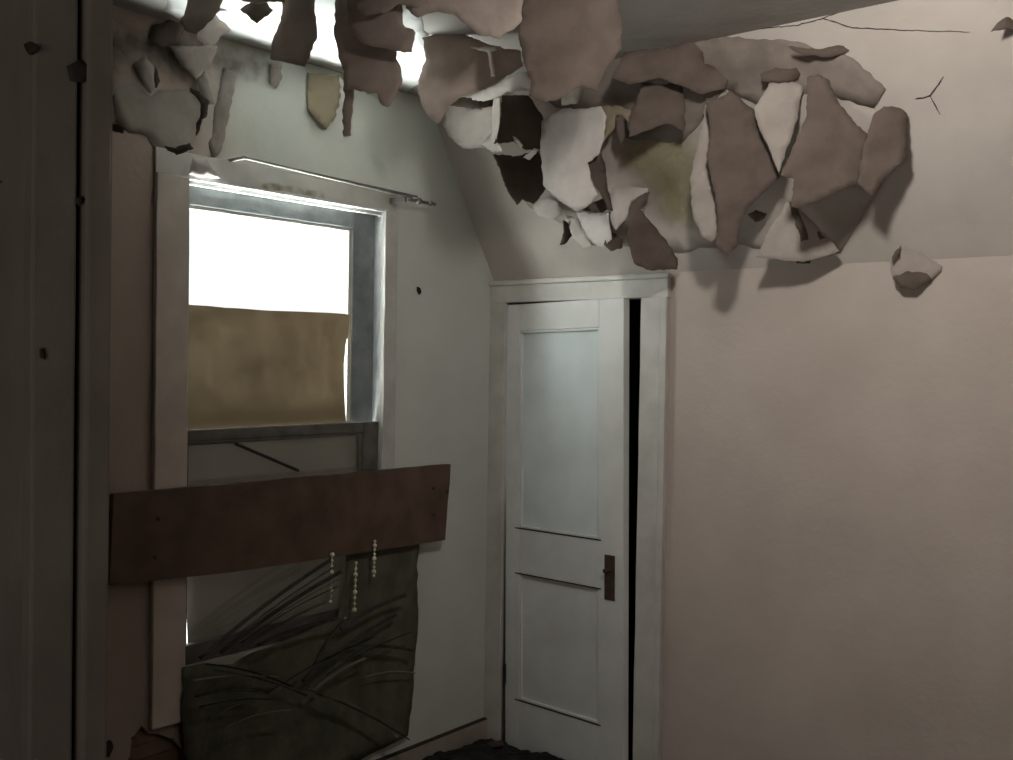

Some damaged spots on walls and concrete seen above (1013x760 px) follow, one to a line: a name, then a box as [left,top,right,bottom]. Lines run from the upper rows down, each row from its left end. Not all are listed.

peeling [991,17,1013,32]
crack [916,76,944,114]
peeling [112,0,907,271]
peeling [890,246,943,290]